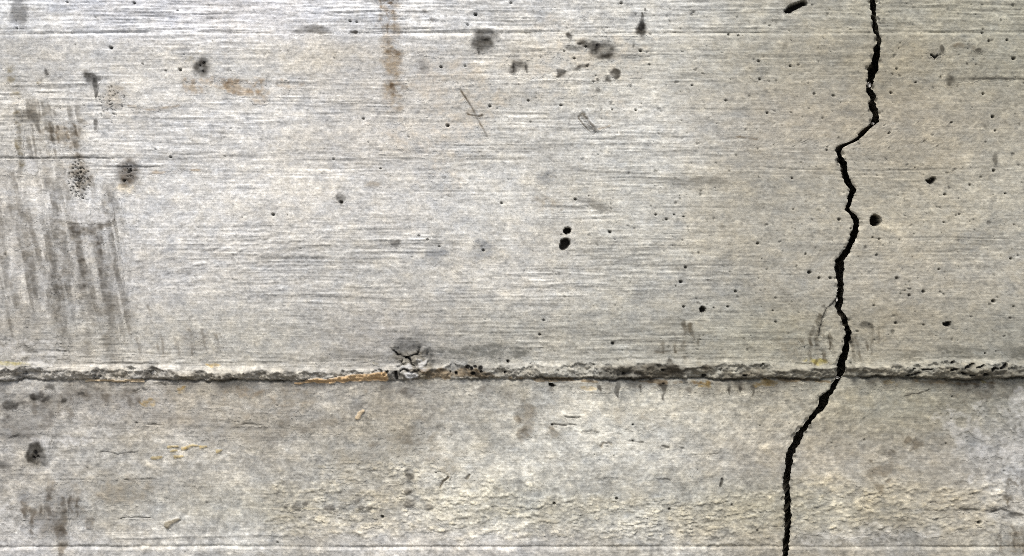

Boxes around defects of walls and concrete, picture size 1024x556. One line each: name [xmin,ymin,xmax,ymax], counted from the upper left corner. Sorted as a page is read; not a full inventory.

damp [0,63,835,483]
crack [782,0,882,556]